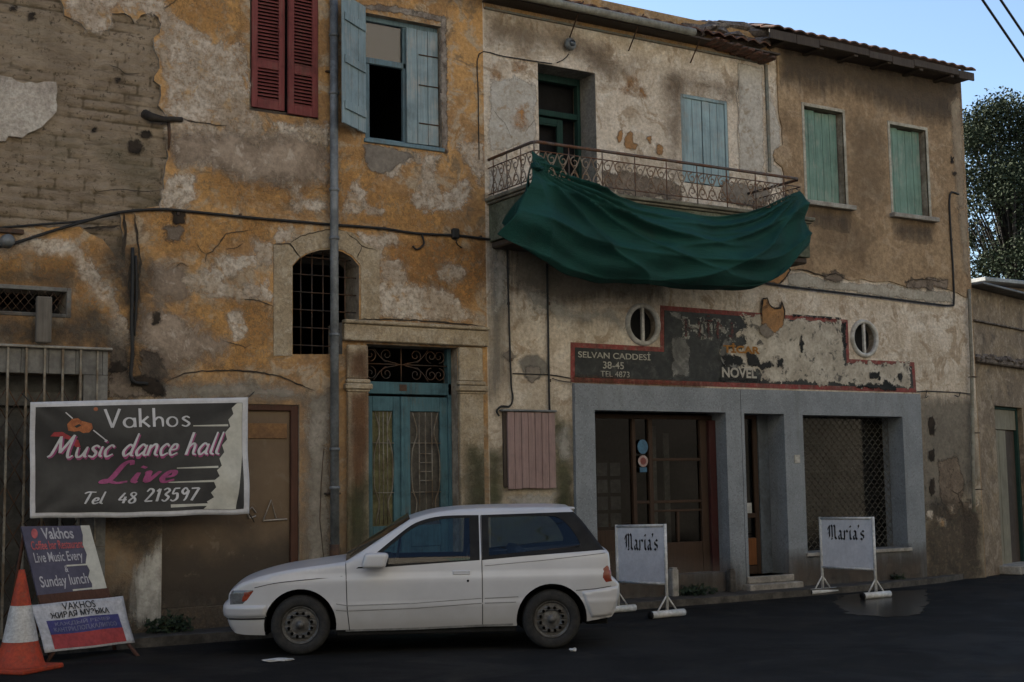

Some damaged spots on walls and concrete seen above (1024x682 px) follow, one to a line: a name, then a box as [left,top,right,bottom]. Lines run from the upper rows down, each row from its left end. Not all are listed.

flaking render [617,130,663,155]
flaking render [0,0,537,398]
crack [176,230,248,267]
crack [164,341,314,391]
peeling [671,336,690,377]
peeling [719,299,912,392]
water stain [793,399,983,586]
water stain [610,561,739,599]